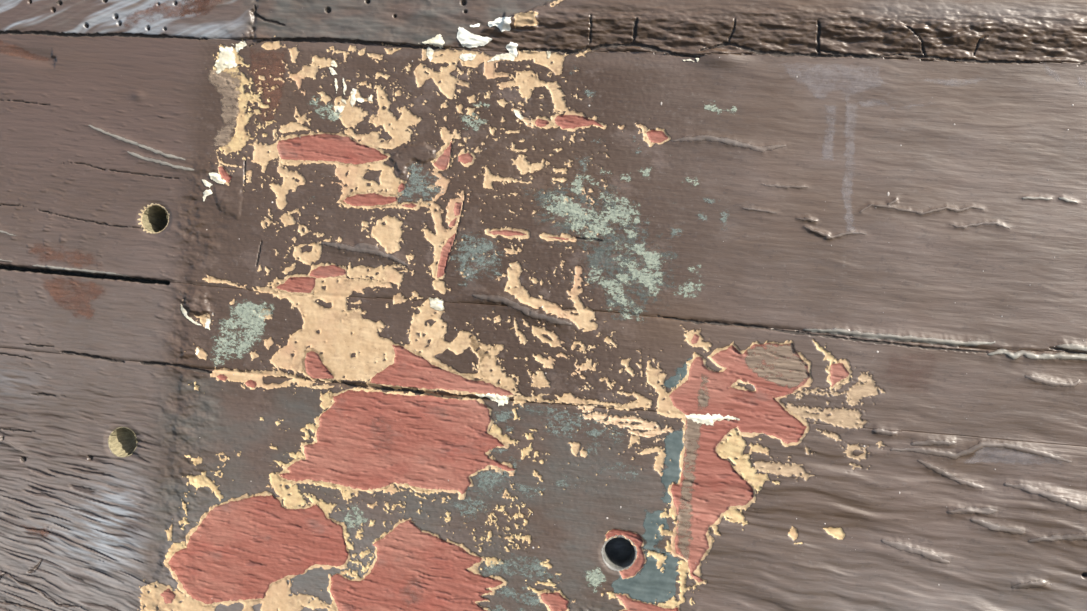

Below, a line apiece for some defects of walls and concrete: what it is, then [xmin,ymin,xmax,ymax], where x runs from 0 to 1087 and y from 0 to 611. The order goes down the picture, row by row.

crack [0,560,78,611]
peeling [139,0,886,611]